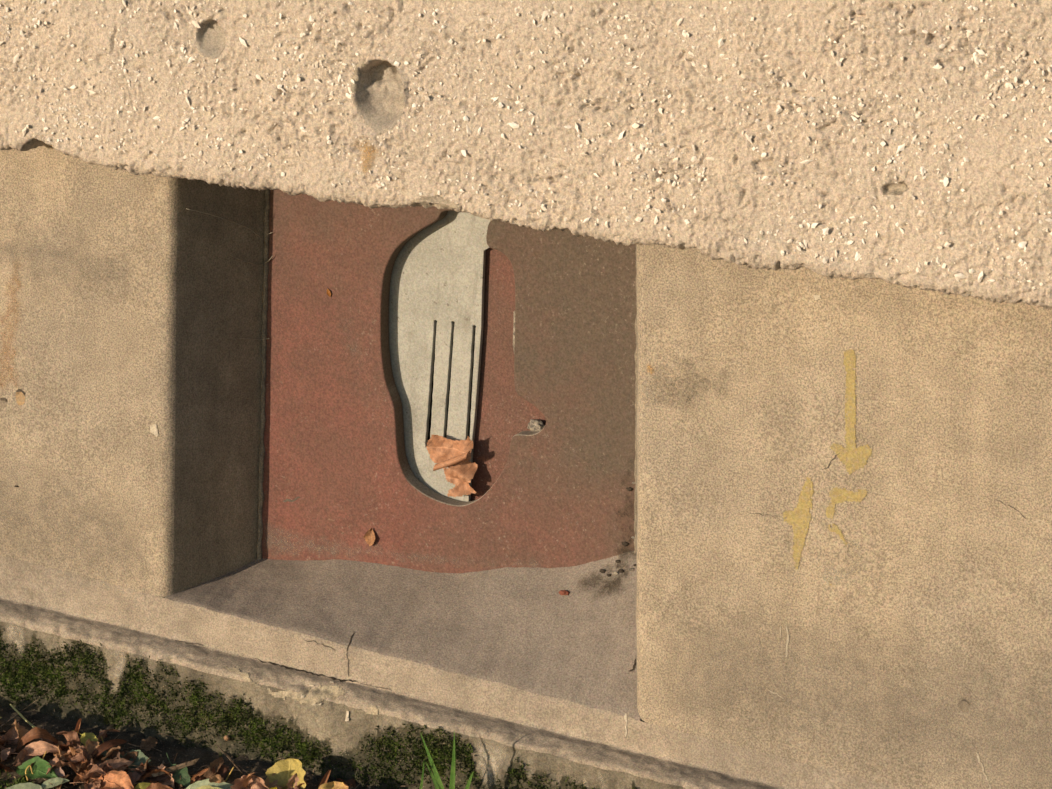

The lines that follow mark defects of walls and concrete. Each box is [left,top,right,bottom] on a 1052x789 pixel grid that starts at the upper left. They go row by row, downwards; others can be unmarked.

spalling [0,0,1052,290]
crack [253,631,390,690]